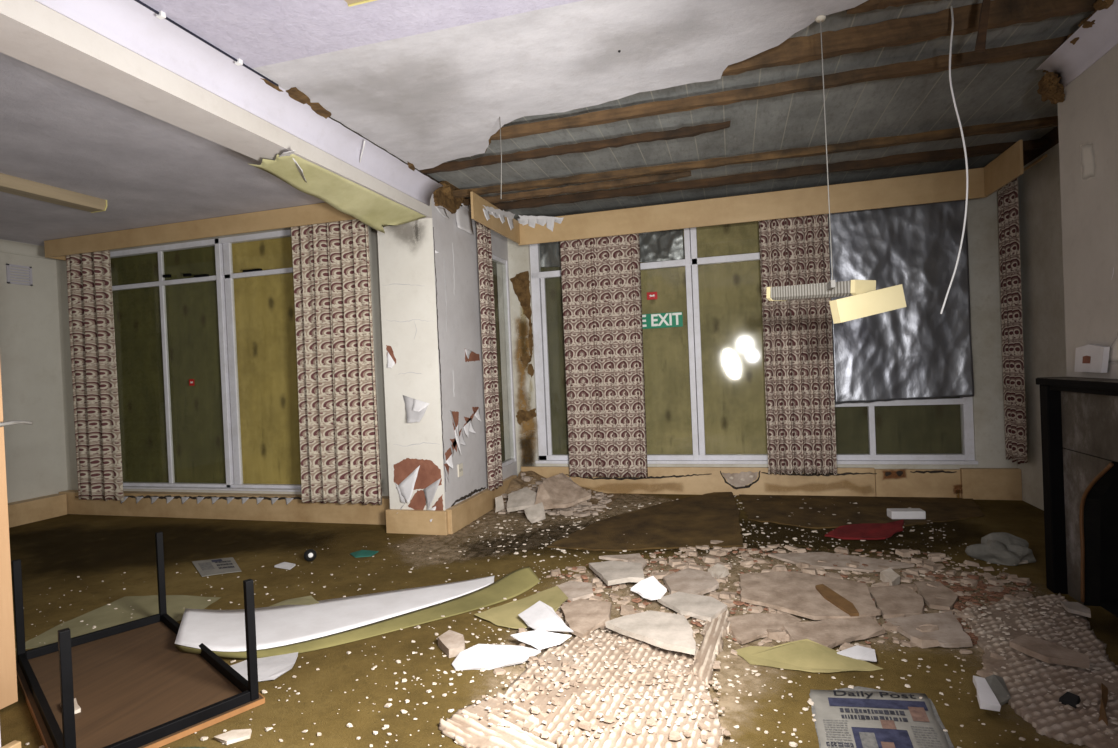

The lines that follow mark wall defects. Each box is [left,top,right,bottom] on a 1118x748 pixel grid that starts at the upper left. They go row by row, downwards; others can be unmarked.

flaking render [1067,0,1114,45]
flaking render [1037,70,1065,104]
peeling [433,181,564,235]
peeling [386,345,396,368]
peeling [465,349,480,362]
peeling [403,395,430,423]
water stain [516,308,536,466]
peeling [394,407,481,522]